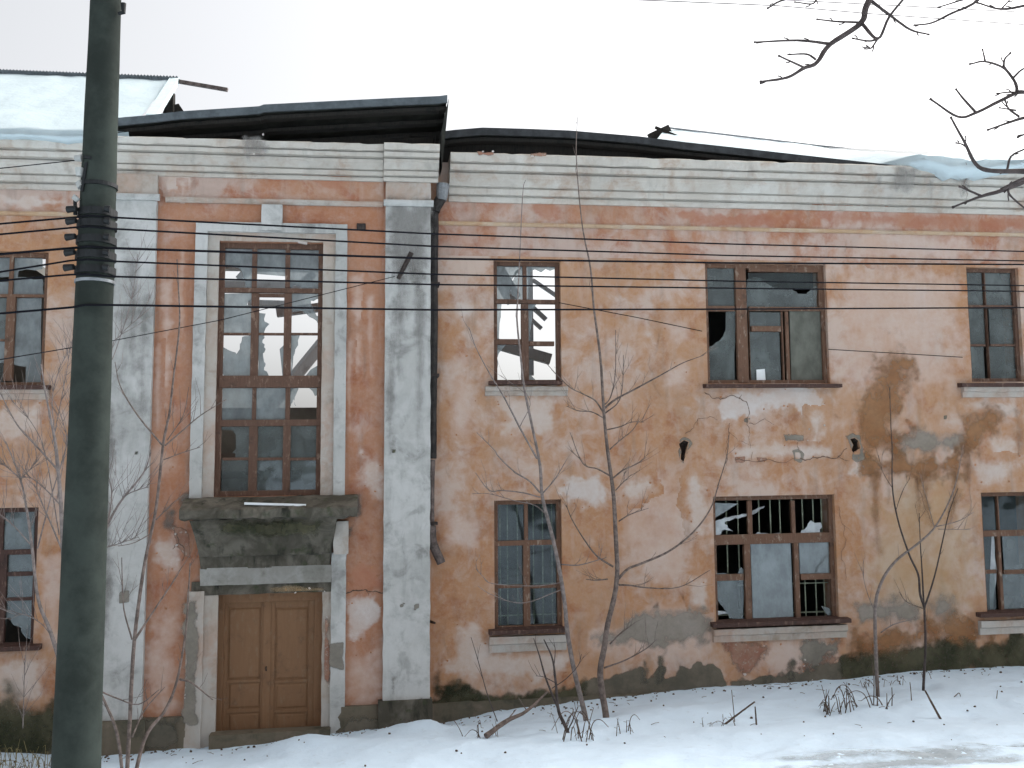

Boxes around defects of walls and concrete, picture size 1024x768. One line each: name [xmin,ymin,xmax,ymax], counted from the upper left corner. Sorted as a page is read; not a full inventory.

peeling [676,437,715,540]
crack [685,393,848,472]
peeling [712,388,875,489]
water stain [898,428,966,453]
peeling [181,602,199,726]
peeling [324,556,383,708]